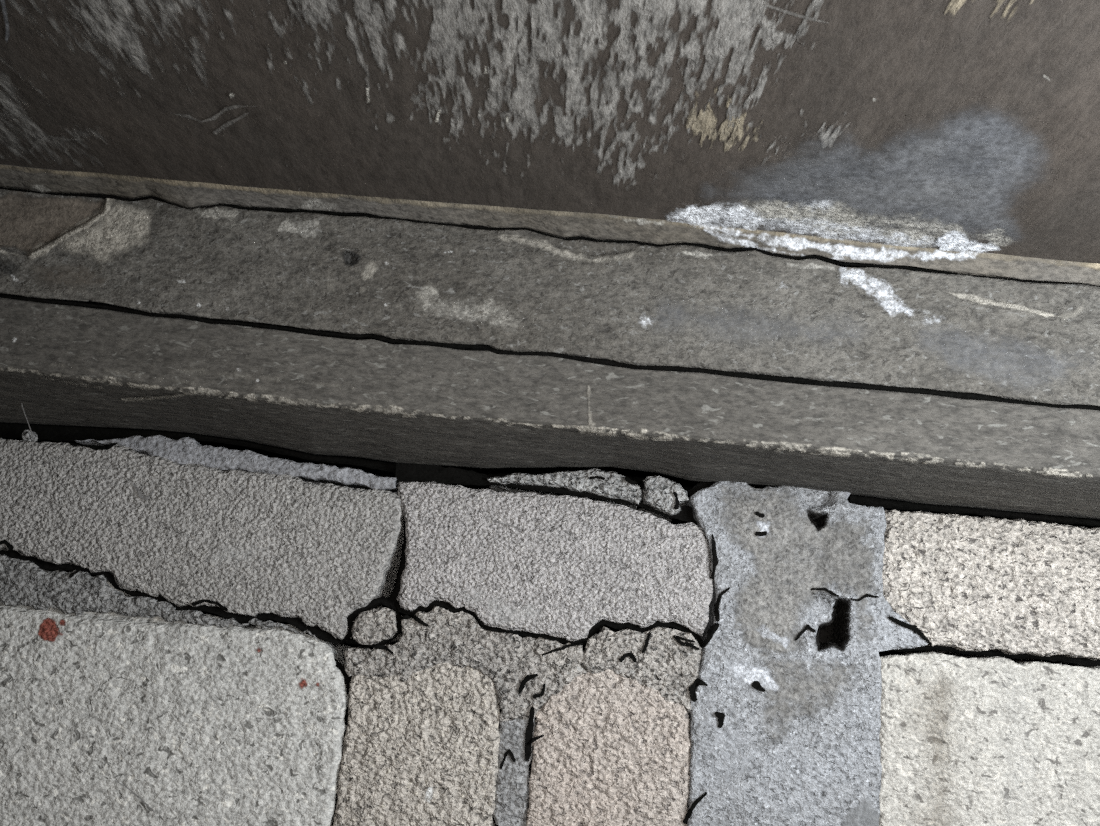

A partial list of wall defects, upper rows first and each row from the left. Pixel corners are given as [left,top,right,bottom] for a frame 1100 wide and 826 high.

efflorescence [636,115,1038,315]
crack [0,294,1100,410]
crack [582,413,596,433]
spalling [808,510,828,530]
crack [0,423,730,769]
crack [795,625,816,641]
hole [816,597,851,651]
crack [811,587,1100,666]